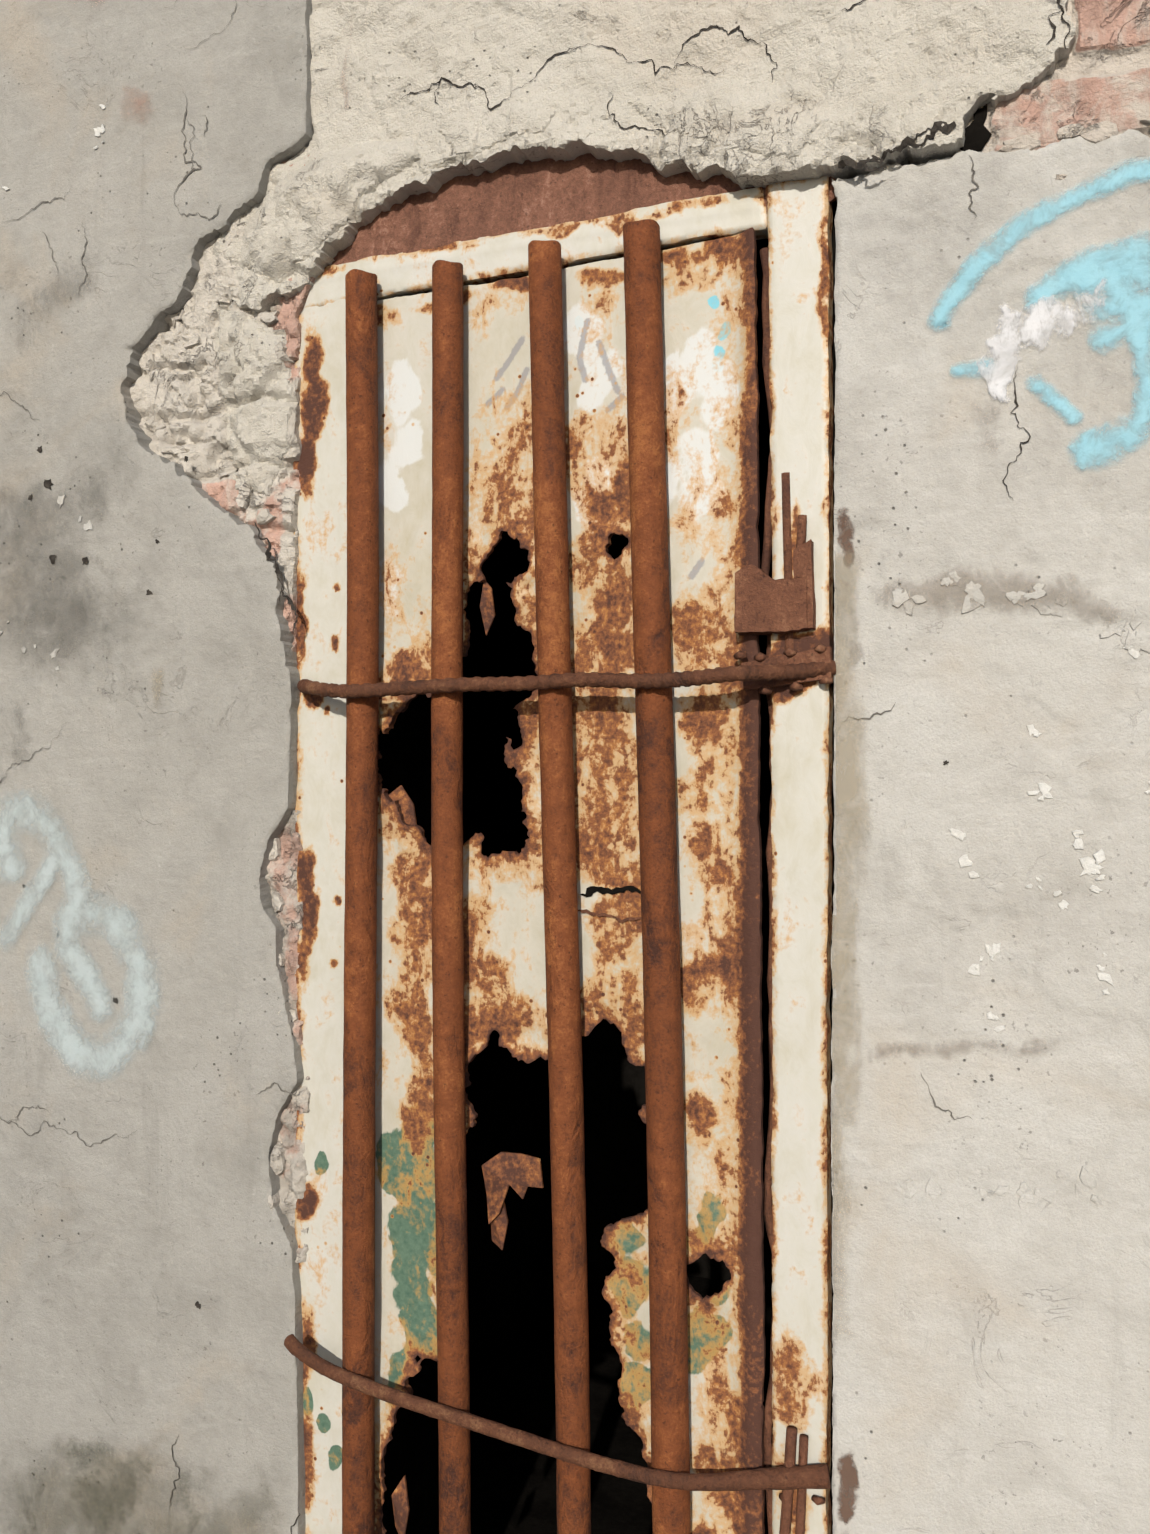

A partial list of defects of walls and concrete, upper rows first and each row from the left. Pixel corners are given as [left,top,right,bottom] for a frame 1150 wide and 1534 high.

crack [401,25,777,136]
spalling [965,0,1150,153]
crack [174,93,220,220]
crack [838,121,979,218]
spalling [130,215,315,652]
spalling [265,810,304,1045]
spalling [268,1076,311,1263]
crack [169,1435,180,1512]
corrosion [837,1455,859,1523]